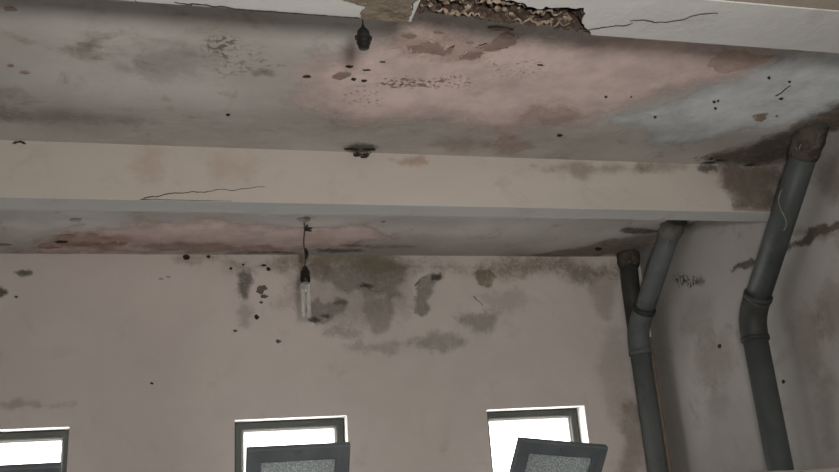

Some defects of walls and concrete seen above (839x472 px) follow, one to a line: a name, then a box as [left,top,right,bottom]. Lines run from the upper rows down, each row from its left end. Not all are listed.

crack [174,2,360,19]
spalling [344,0,591,60]
crack [582,13,716,32]
spalling [332,65,371,82]
peeling [381,76,470,88]
water stain [701,104,839,209]
crack [140,186,263,201]
water stain [35,219,405,297]
water stain [476,270,495,287]
water stain [414,273,441,316]